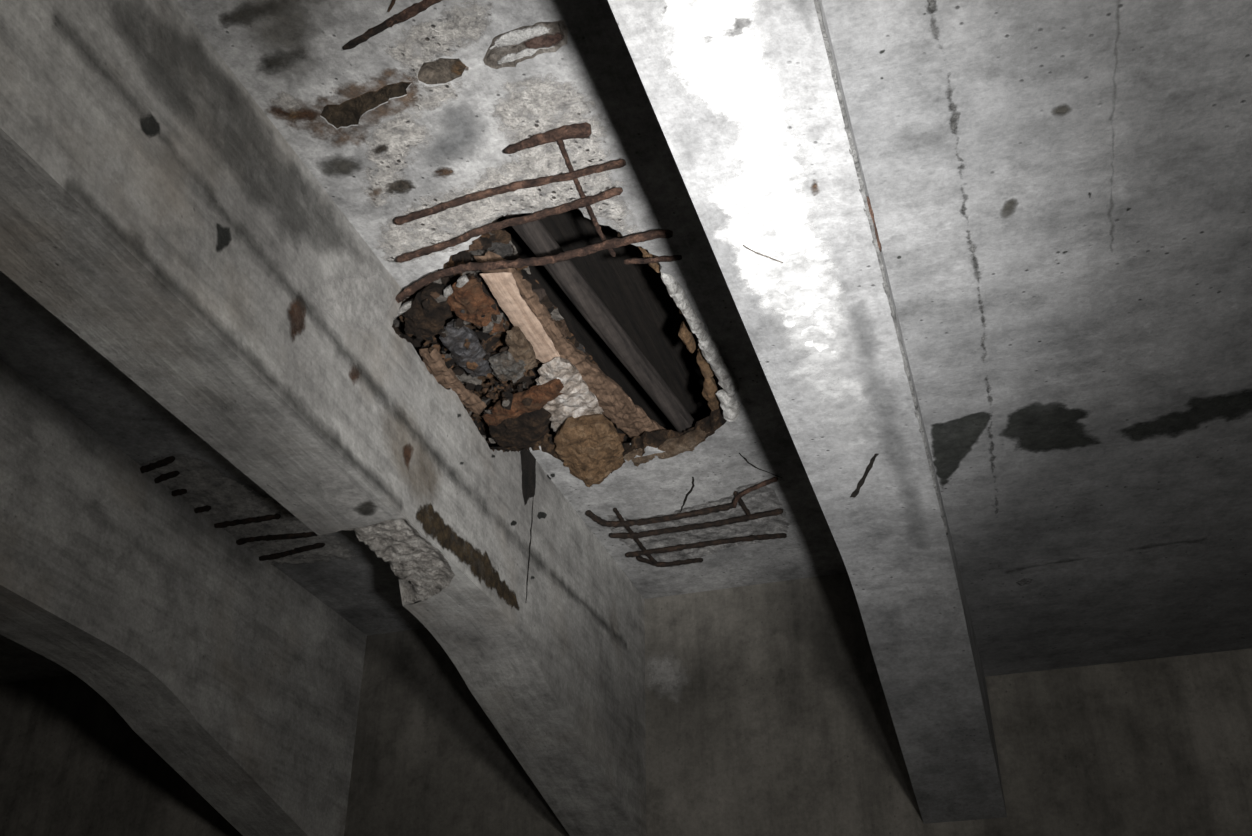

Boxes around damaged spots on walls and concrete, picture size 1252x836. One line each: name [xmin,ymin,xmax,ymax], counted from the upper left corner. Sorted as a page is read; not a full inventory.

peeling [267,0,741,479]
peeling [661,0,865,449]
crack [850,454,879,498]
leakage [932,412,990,486]
leakage [1002,403,1099,452]
leakage [1122,389,1252,441]
rust [416,504,519,610]